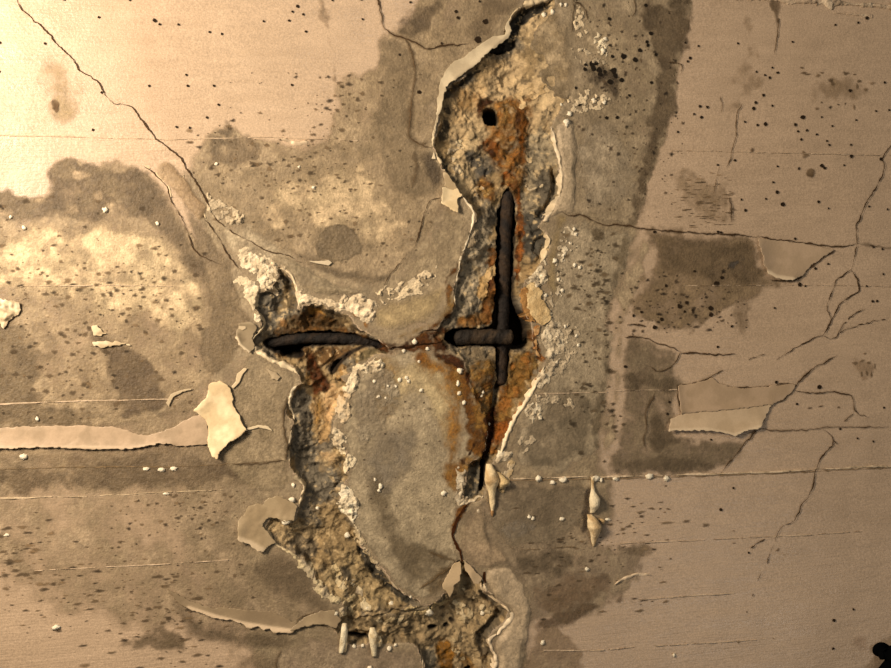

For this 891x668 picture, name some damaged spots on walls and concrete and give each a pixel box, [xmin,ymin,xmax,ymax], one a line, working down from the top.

peeling [0,368,272,459]
crack [17,1,302,269]
corrosion [306,353,330,423]
spalling [166,267,514,668]
crack [377,0,461,148]
corrosion [379,248,545,490]
water stain [477,259,496,301]
corrosion [470,98,531,280]
spalling [432,0,571,506]
water stain [612,330,742,476]
crack [566,97,891,595]
water stain [176,612,425,668]